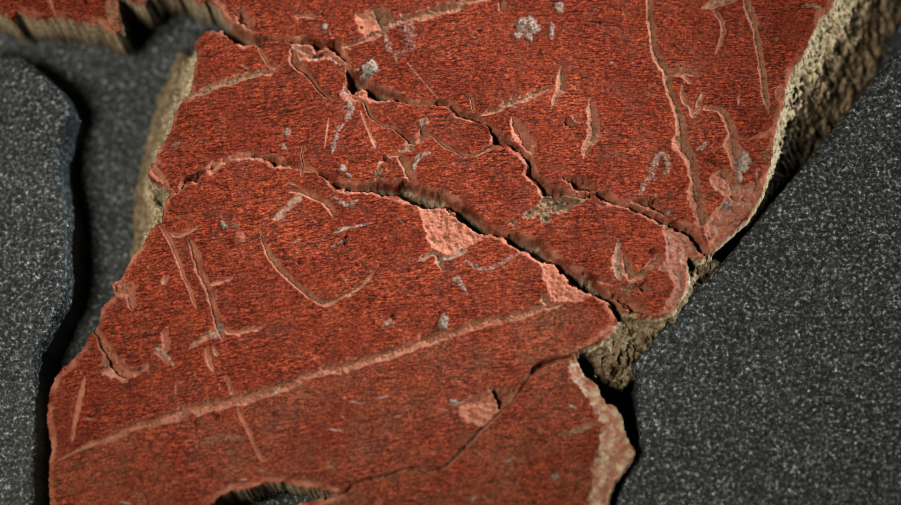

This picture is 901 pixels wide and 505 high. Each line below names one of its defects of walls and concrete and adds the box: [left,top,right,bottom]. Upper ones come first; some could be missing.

spalling [0,0,257,296]
crack [219,14,711,266]
spalling [551,66,568,108]
crack [152,144,631,325]
spalling [416,206,484,271]
spalling [561,0,901,505]
spalling [46,337,89,505]
spalling [159,327,172,353]
spalling [210,479,325,505]
crack [321,352,575,502]